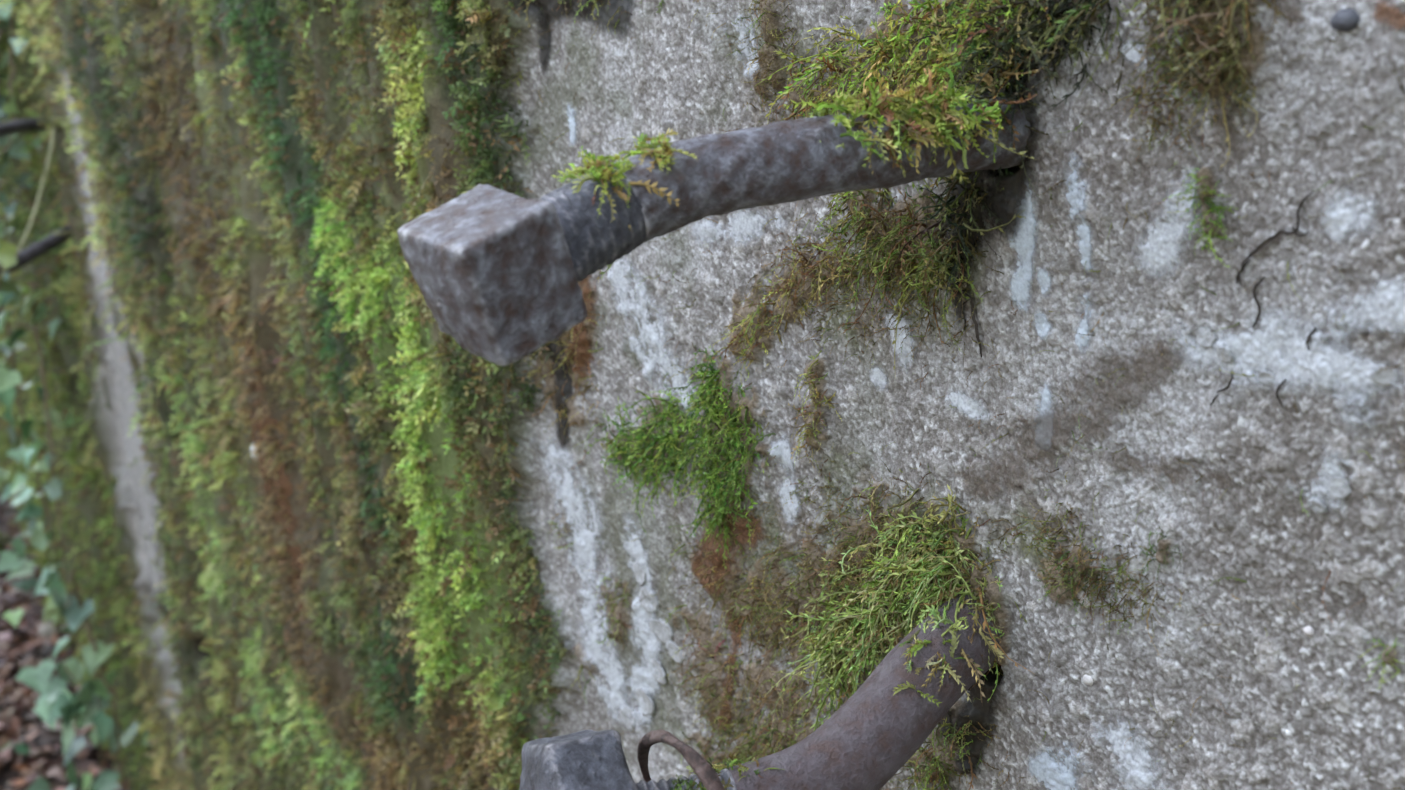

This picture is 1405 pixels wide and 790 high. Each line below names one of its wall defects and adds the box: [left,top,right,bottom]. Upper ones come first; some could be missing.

rust [567,277,596,379]
damp [541,336,660,726]